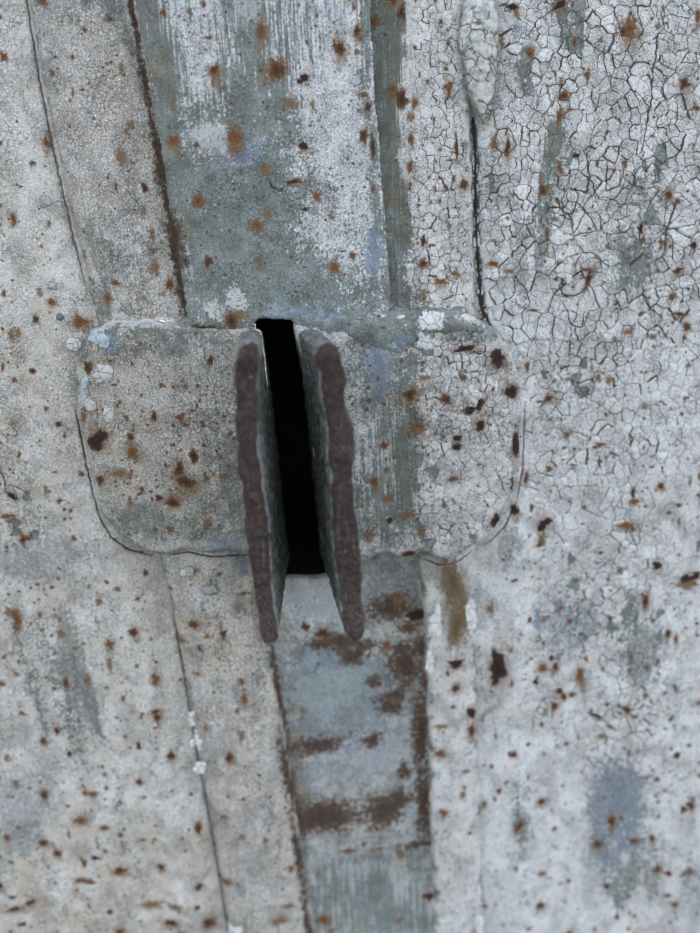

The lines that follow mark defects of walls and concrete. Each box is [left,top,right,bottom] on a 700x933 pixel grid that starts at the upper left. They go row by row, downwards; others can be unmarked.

crack [0,377,48,580]
rust [370,352,518,487]
crack [393,0,700,789]
rust [226,585,449,933]
rust [499,597,630,836]